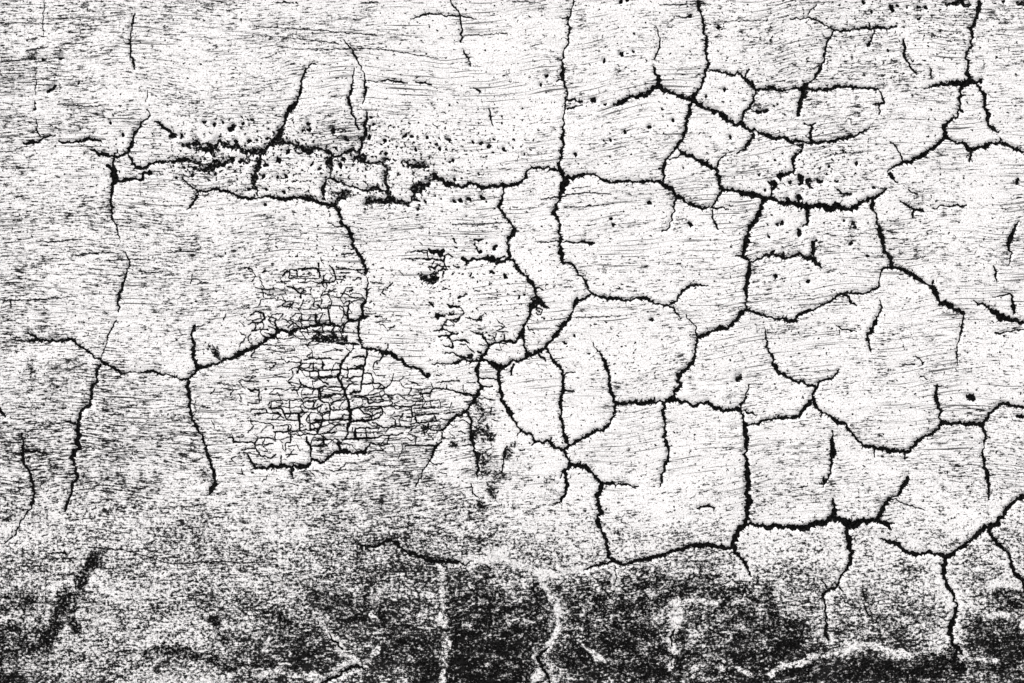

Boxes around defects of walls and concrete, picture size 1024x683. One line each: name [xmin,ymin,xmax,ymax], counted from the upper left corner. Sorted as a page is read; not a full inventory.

crack [22,68,190,238]
crack [276,63,316,141]
crack [343,39,432,157]
crack [410,0,494,126]
crack [116,251,131,312]
crack [11,264,497,512]
crack [181,178,371,283]
crack [417,248,453,278]
crack [431,0,1024,666]
crack [0,407,46,544]
crack [352,538,472,566]
crack [320,633,366,683]